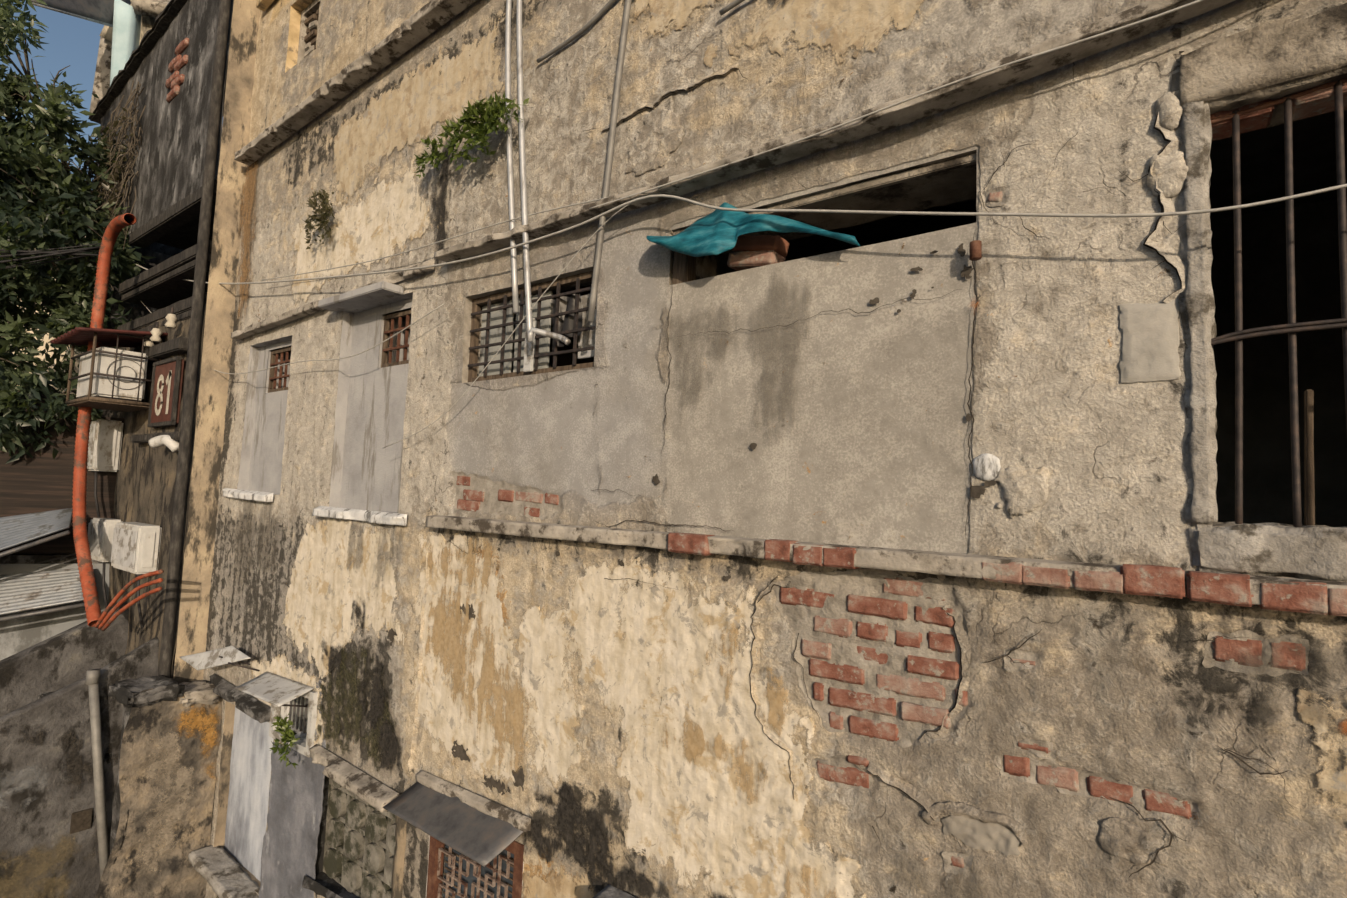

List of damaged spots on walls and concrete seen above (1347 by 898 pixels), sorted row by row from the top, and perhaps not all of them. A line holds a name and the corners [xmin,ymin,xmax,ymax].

peeling [624,0,723,37]
peeling [696,0,923,68]
crack [1083,90,1188,303]
crack [661,132,1078,535]
flaking render [450,471,563,520]
leakage [321,641,342,673]
leakage [351,602,365,637]
leakage [357,655,401,770]
peeling [251,518,975,898]
flaking render [1202,630,1347,819]
leakage [520,784,669,898]
crack [1110,797,1186,877]